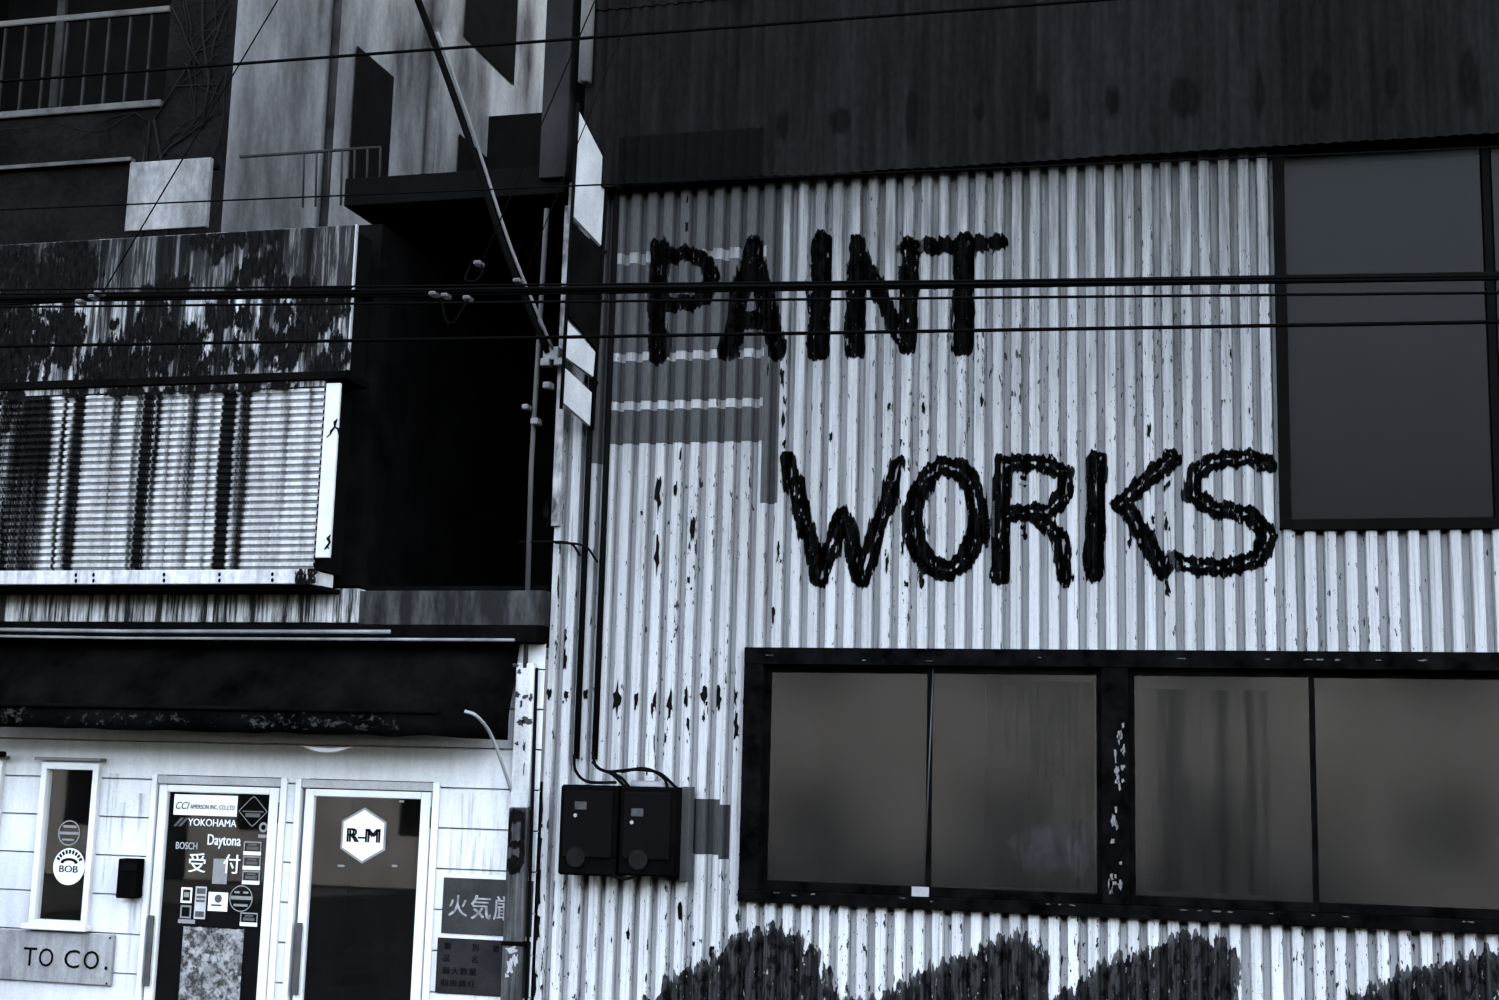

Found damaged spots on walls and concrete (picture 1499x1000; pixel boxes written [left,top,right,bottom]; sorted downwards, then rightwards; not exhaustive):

leakage [262,227,316,332]
leakage [0,233,290,571]
peeling [547,629,567,669]
peeling [612,682,739,751]
peeling [513,663,588,941]